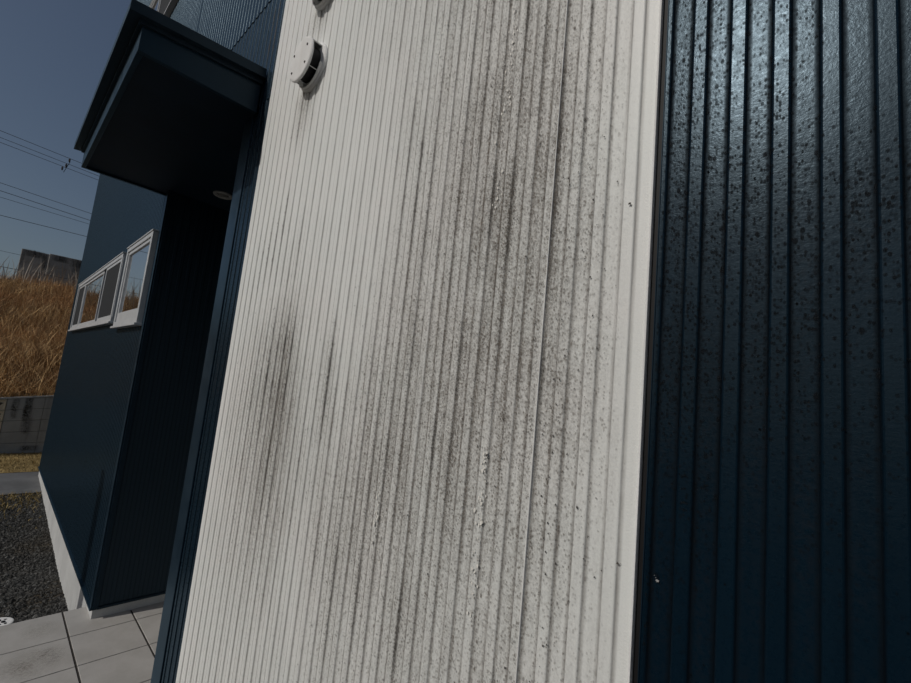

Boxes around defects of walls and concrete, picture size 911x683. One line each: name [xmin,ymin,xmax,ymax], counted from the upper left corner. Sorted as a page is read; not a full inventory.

leakage [234,0,605,683]